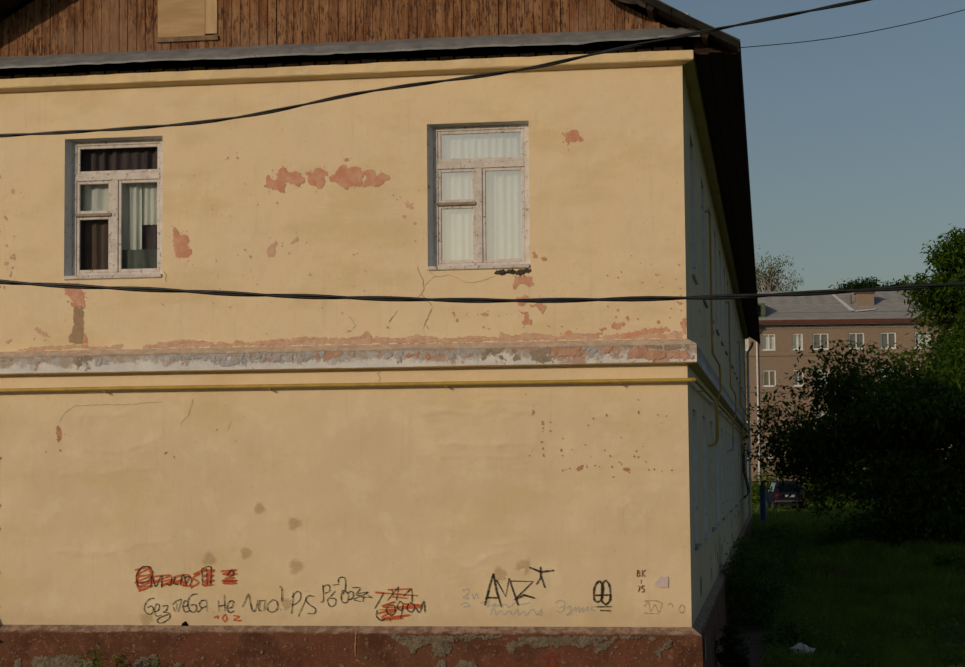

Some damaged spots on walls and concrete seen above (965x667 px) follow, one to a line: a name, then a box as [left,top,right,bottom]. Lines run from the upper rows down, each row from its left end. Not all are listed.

peeling [562,128,583,151]
peeling [264,158,390,204]
peeling [169,225,192,262]
peeling [64,283,86,320]
peeling [143,252,694,367]
crack [417,267,491,329]
flaking render [389,634,672,667]